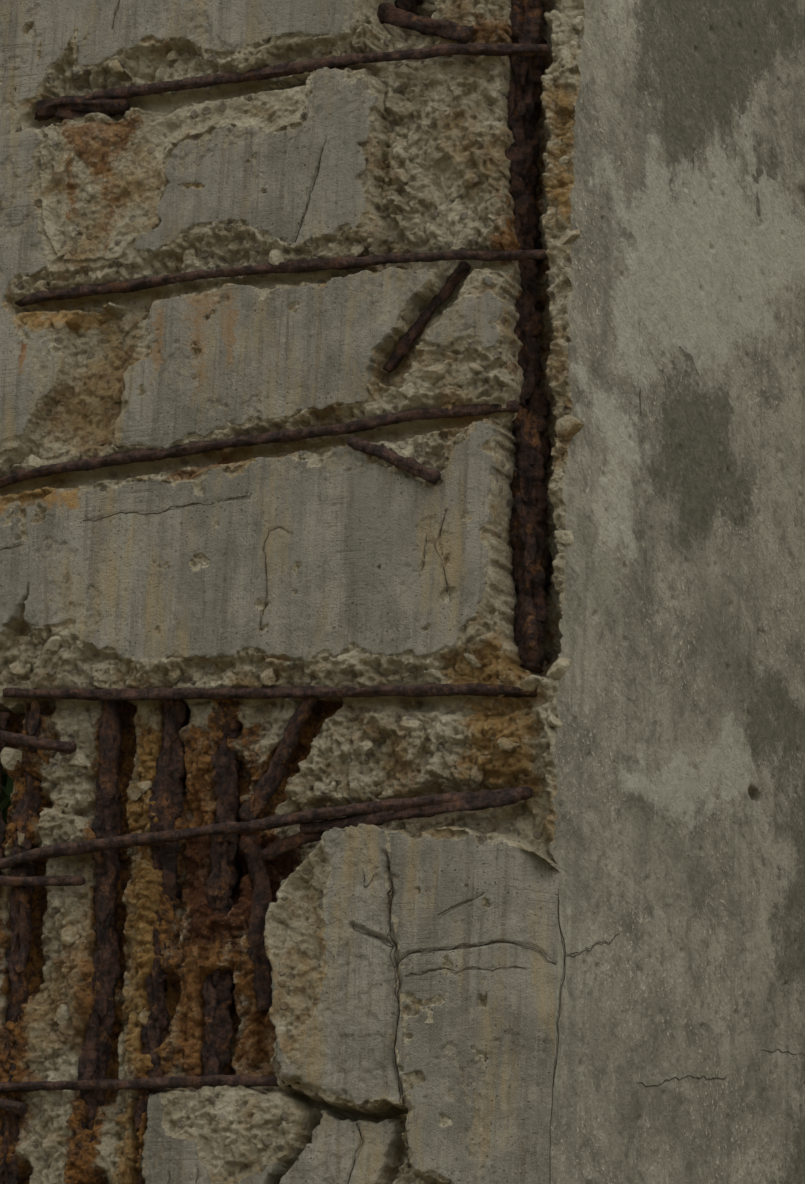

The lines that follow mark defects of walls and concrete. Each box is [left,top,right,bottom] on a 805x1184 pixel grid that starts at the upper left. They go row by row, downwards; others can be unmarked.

rust [0,477,103,522]
rust [0,300,130,382]
rust [36,94,148,260]
spalling [0,0,586,865]
rust [377,0,514,67]
rust [535,25,580,286]
water stain [566,0,805,588]
rust [0,907,100,1099]
spalling [0,587,495,1184]
rust [100,629,558,1184]
crack [353,854,619,1182]
water stain [613,576,805,1184]